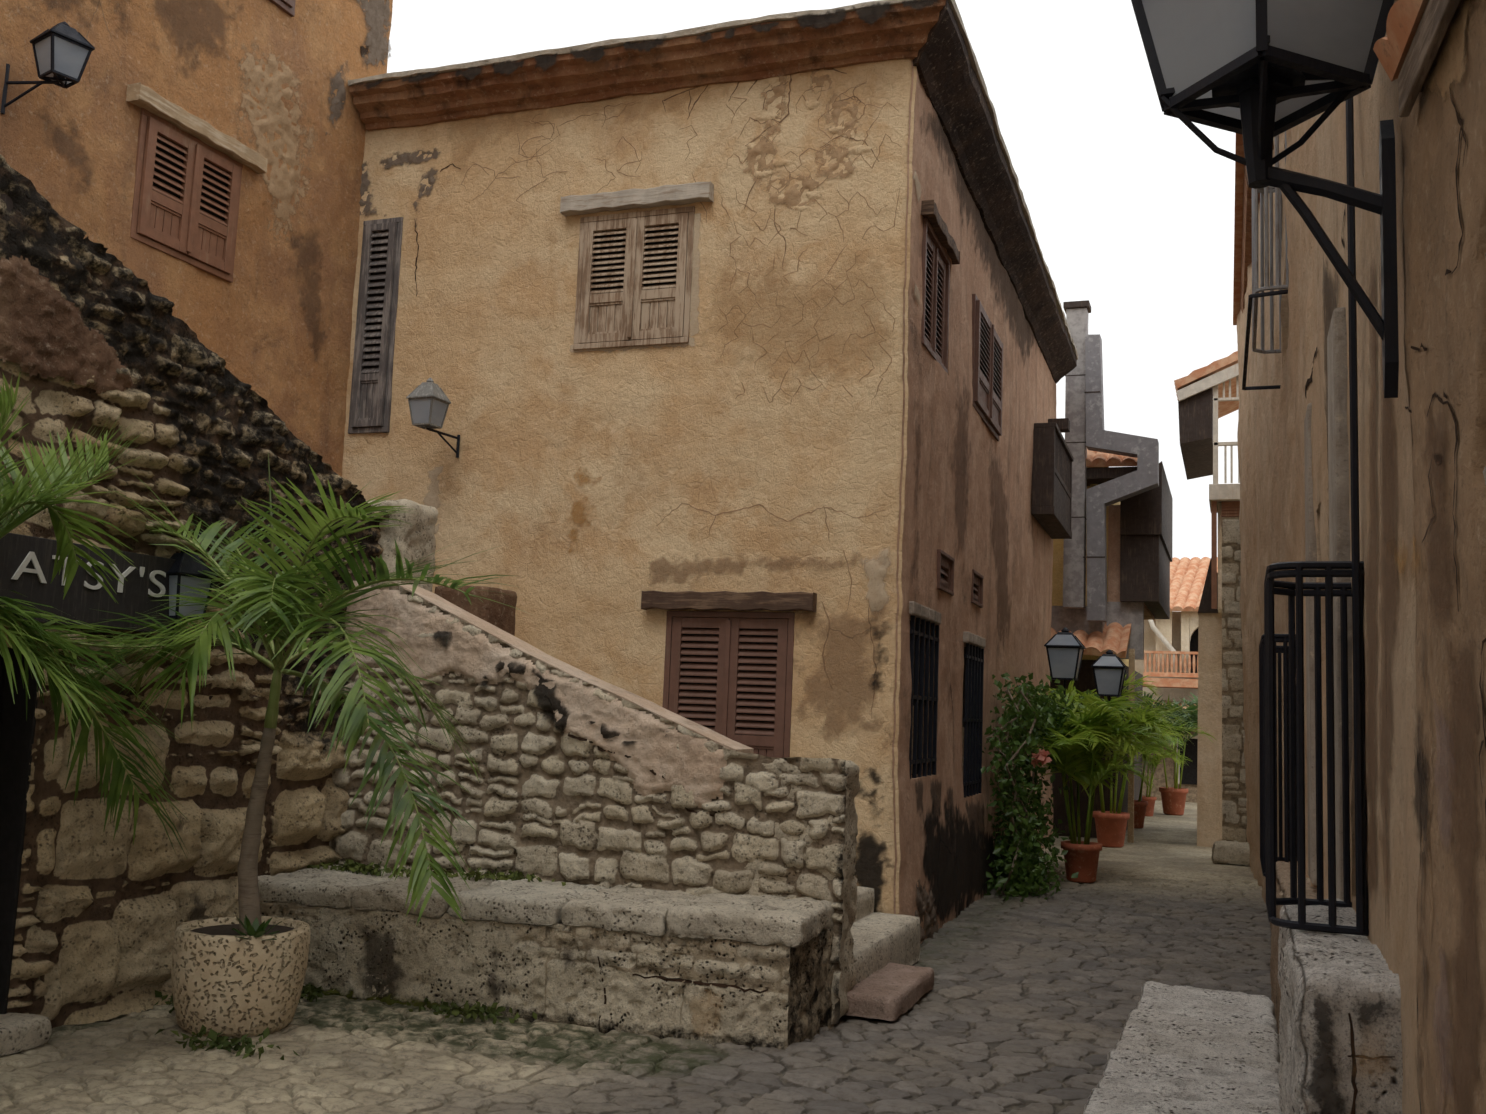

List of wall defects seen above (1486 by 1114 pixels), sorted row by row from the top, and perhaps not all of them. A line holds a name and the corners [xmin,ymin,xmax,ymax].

leakage [156,0,225,58]
flaking render [356,0,391,66]
flaking render [359,148,440,227]
crack [412,219,420,296]
crack [440,69,901,405]
crack [1445,87,1466,275]
crack [1405,389,1459,611]
crack [1478,638,1486,815]